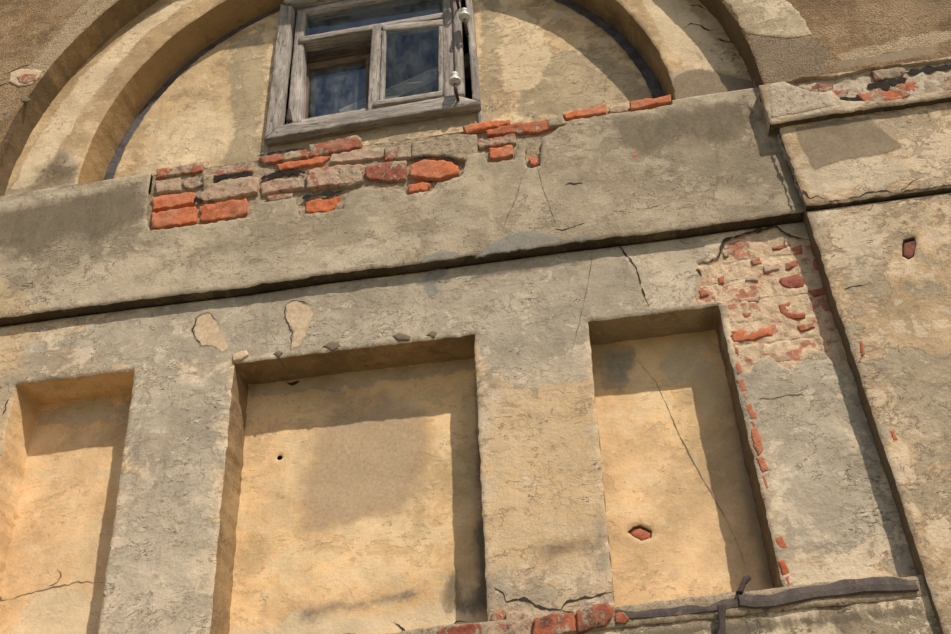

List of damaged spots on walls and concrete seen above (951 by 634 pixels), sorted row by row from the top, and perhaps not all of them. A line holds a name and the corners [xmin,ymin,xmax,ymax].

flaking render [9,69,43,103]
flaking render [786,59,951,101]
flaking render [146,94,672,231]
flaking render [192,312,249,362]
flaking render [274,300,314,367]
crack [570,256,592,356]
crack [618,245,649,306]
flaking render [694,225,851,502]
crack [632,352,746,567]
crack [0,569,100,601]
crack [495,588,614,612]
spalling [778,560,790,585]